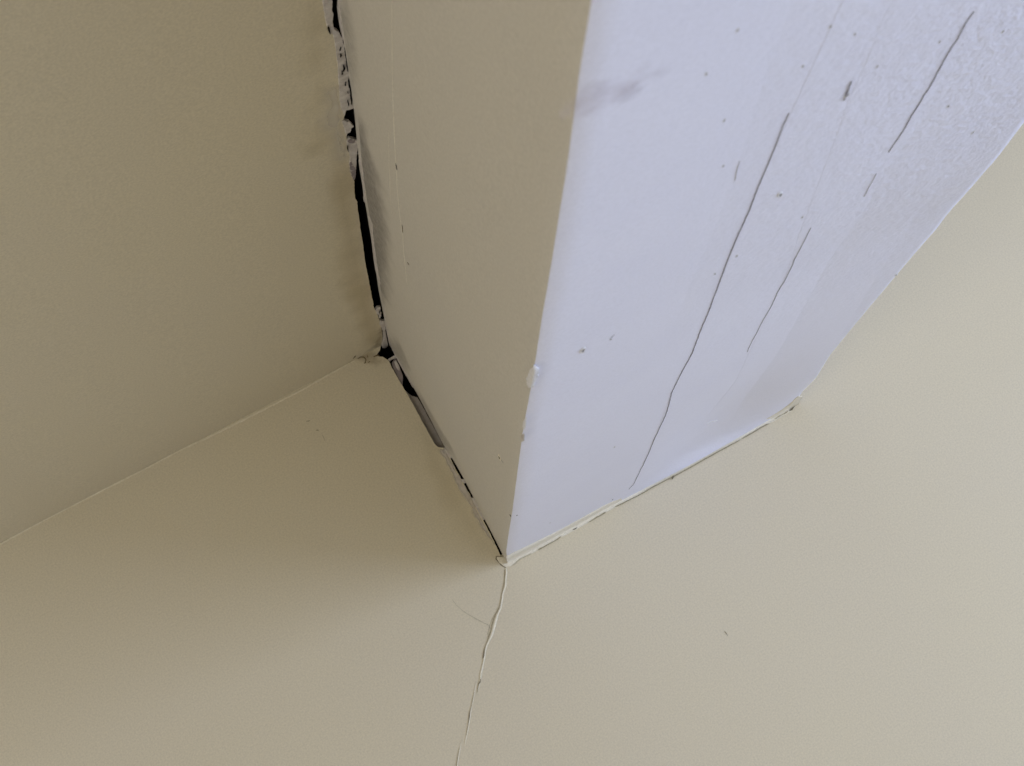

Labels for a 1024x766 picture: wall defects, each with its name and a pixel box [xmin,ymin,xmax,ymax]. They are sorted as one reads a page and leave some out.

crack [889,12,974,152]
crack [452,113,811,766]